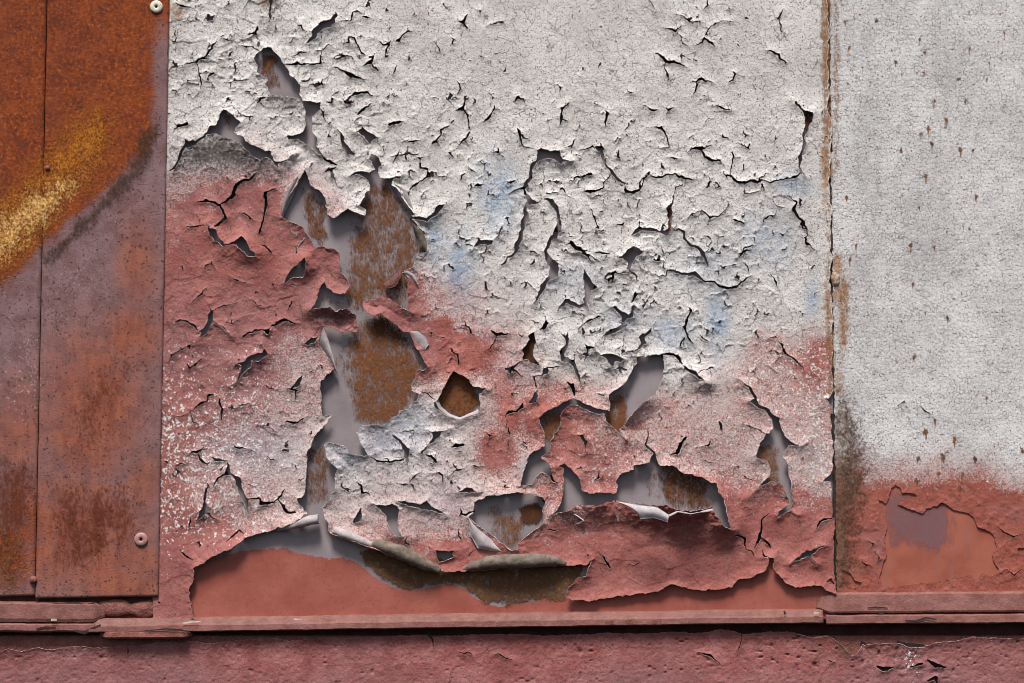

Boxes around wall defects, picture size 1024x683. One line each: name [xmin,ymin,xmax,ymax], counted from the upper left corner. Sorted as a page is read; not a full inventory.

corrosion [0,106,161,283]
crack [181,0,259,89]
peeling [170,109,294,171]
peeling [254,47,321,154]
peeling [795,101,813,176]
corrosion [802,0,850,177]
crack [166,172,318,425]
corrosion [322,181,421,425]
peeling [189,126,832,619]
crack [285,0,838,592]
crack [180,444,304,560]
corrosion [359,548,587,608]